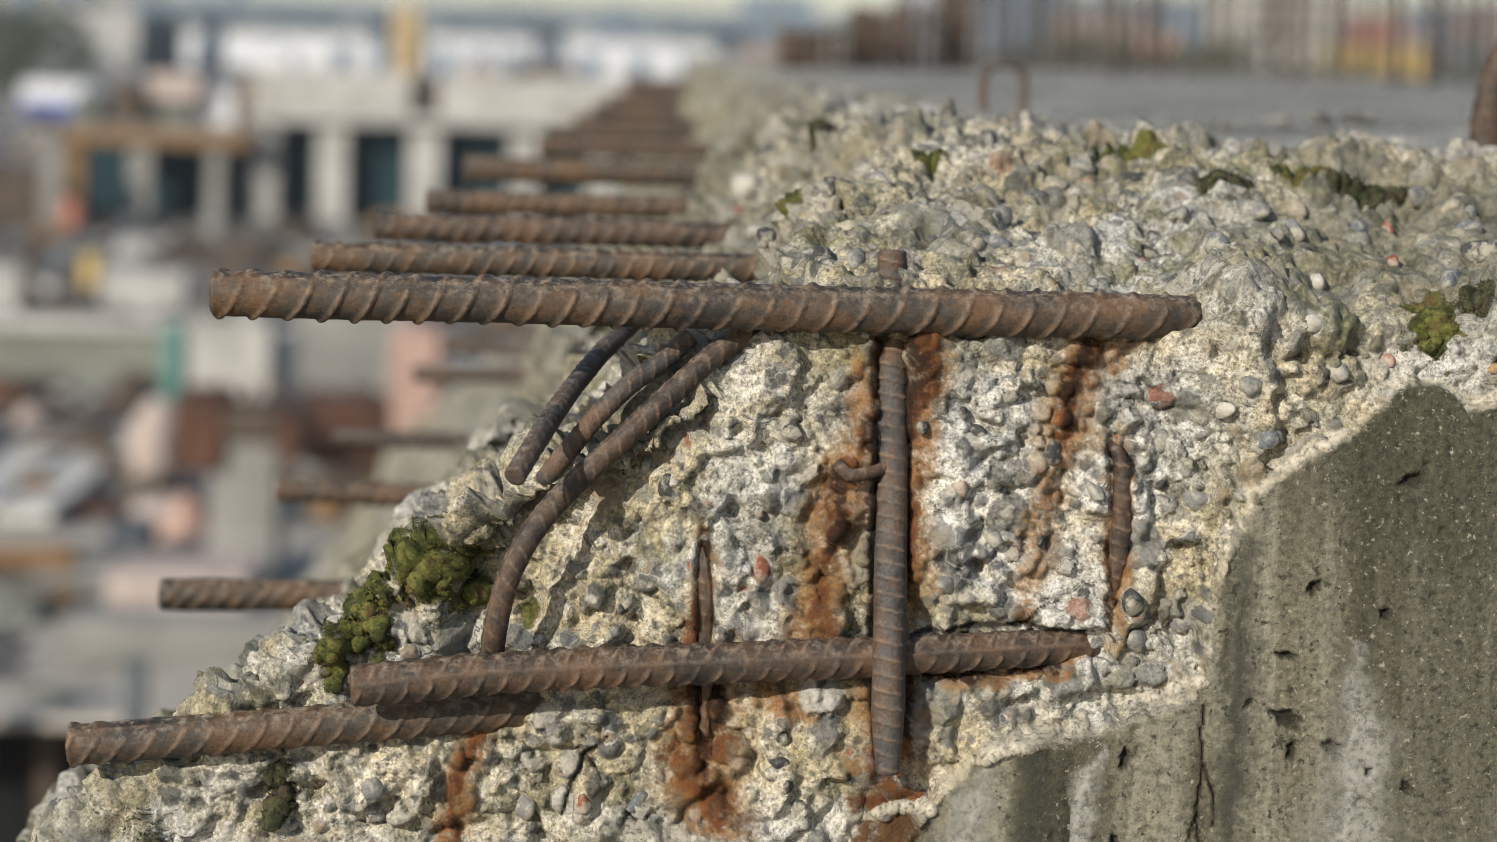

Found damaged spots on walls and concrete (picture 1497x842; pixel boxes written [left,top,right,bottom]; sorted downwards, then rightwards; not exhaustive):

corrosion [65,76,1203,842]
spalling [17,308,1497,842]
spalling [580,55,1497,347]
crack [1188,705,1214,842]